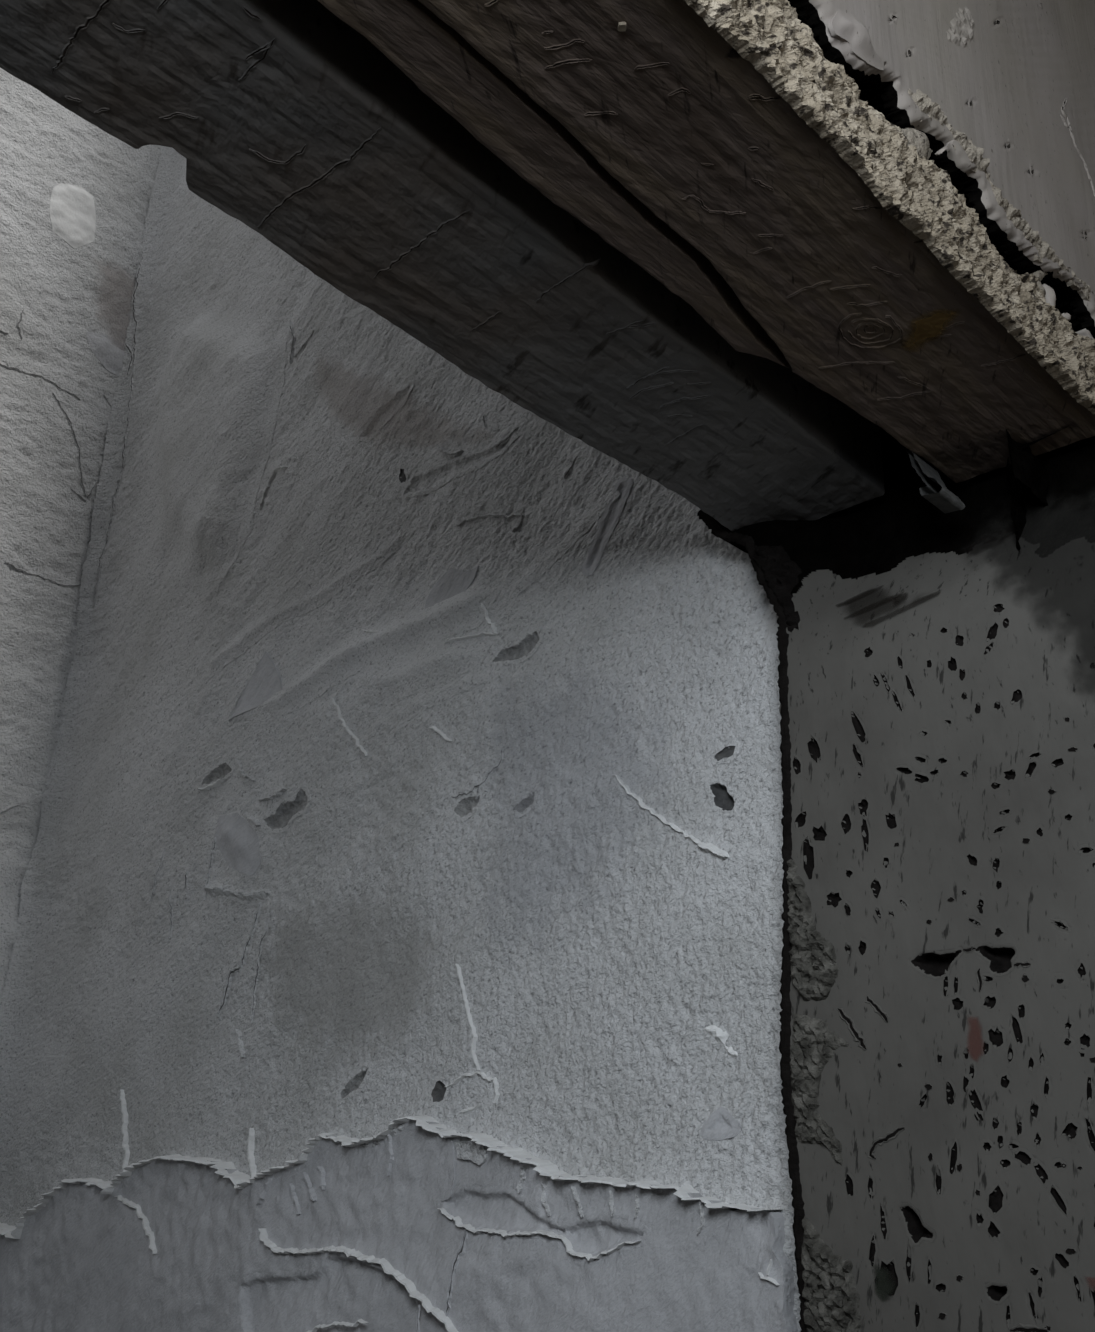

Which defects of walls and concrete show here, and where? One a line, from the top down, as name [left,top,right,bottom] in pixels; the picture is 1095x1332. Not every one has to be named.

crack [902,127,954,160]
crack [1060,97,1095,197]
spalling [908,89,1091,302]
crack [1033,270,1094,339]
spalling [988,741,1095,792]
spalling [1022,824,1046,844]
spalling [947,851,1007,941]
crack [217,902,273,1058]
peeling [0,709,972,1332]
spalling [1051,959,1089,990]
spalling [917,969,1095,1242]
spalling [1002,1248,1095,1332]